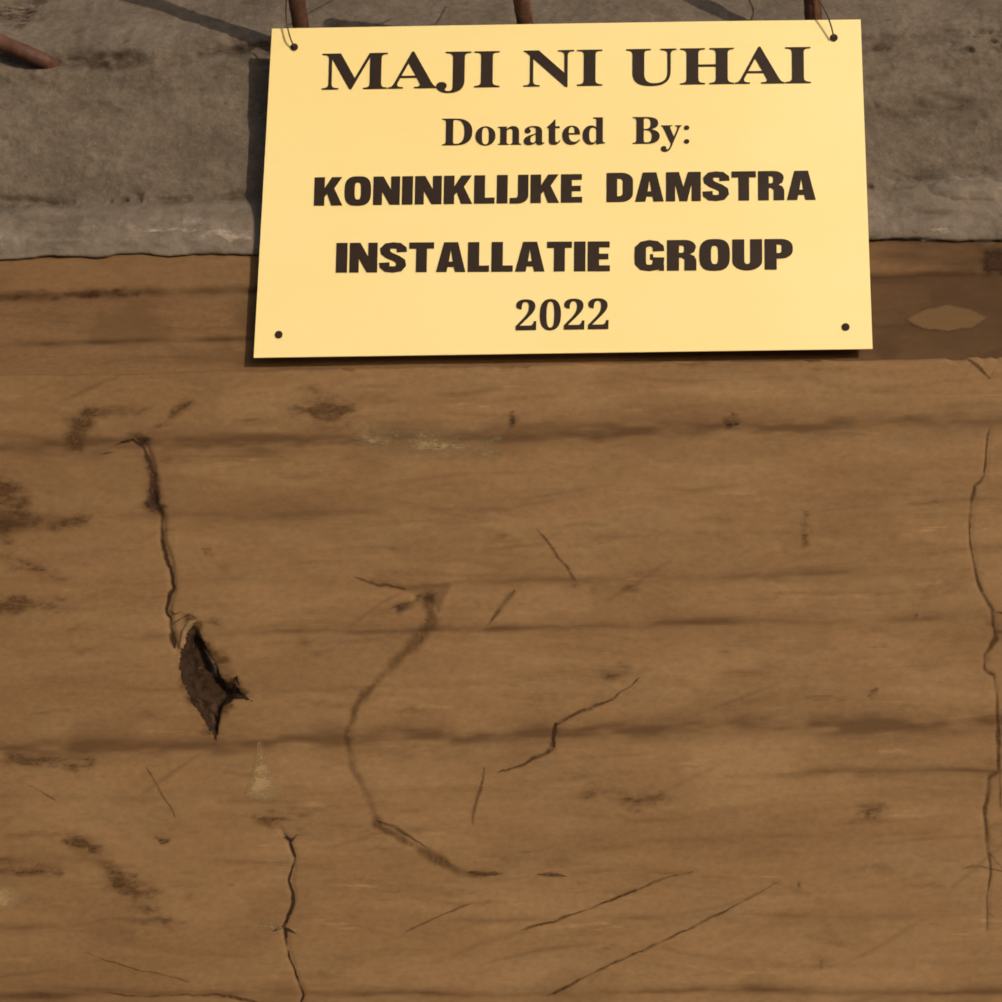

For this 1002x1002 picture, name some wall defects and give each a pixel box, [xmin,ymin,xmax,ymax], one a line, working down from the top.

crack [104,438,194,649]
crack [474,677,640,811]
crack [967,433,1002,928]
crack [179,978,256,1002]
crack [273,834,305,1002]
crack [374,819,503,875]